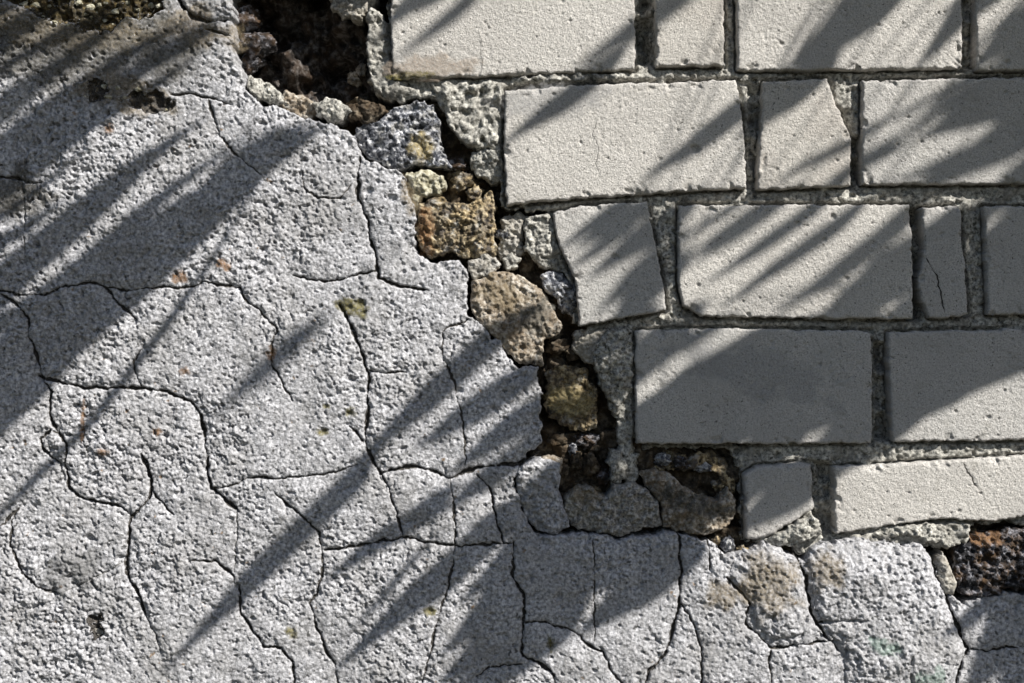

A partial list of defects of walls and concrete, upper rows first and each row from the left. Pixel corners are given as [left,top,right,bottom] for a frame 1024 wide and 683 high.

crack [170,93,261,175]
spalling [339,122,363,136]
spalling [345,95,623,503]
crack [926,258,945,311]
crack [0,157,703,683]
spalling [633,438,755,552]
spalling [969,520,1013,533]
crack [706,539,838,682]
crack [928,553,1024,683]